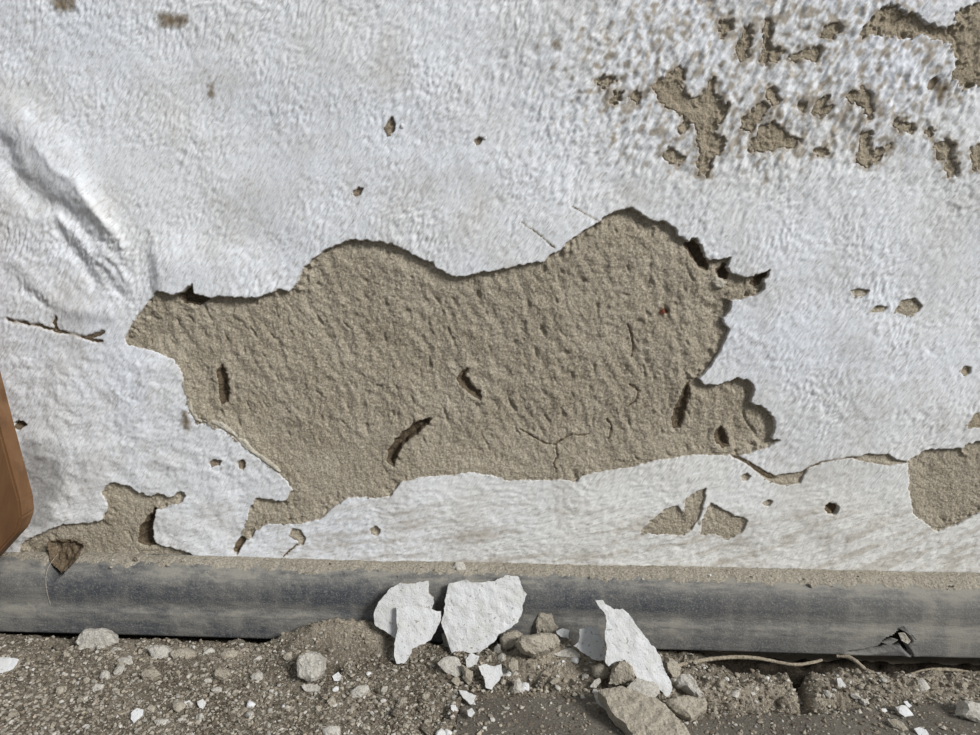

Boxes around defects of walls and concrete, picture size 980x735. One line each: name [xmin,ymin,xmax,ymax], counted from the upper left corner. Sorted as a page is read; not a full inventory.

peeling [718,19,841,64]
spalling [860,3,980,91]
peeling [596,77,641,105]
peeling [652,66,729,178]
peeling [740,88,799,153]
peeling [846,86,891,168]
peeling [892,117,956,178]
crack [8,317,104,342]
peeling [871,298,921,318]
spalling [125,208,805,545]
spalling [855,441,980,531]
spalling [20,482,191,573]